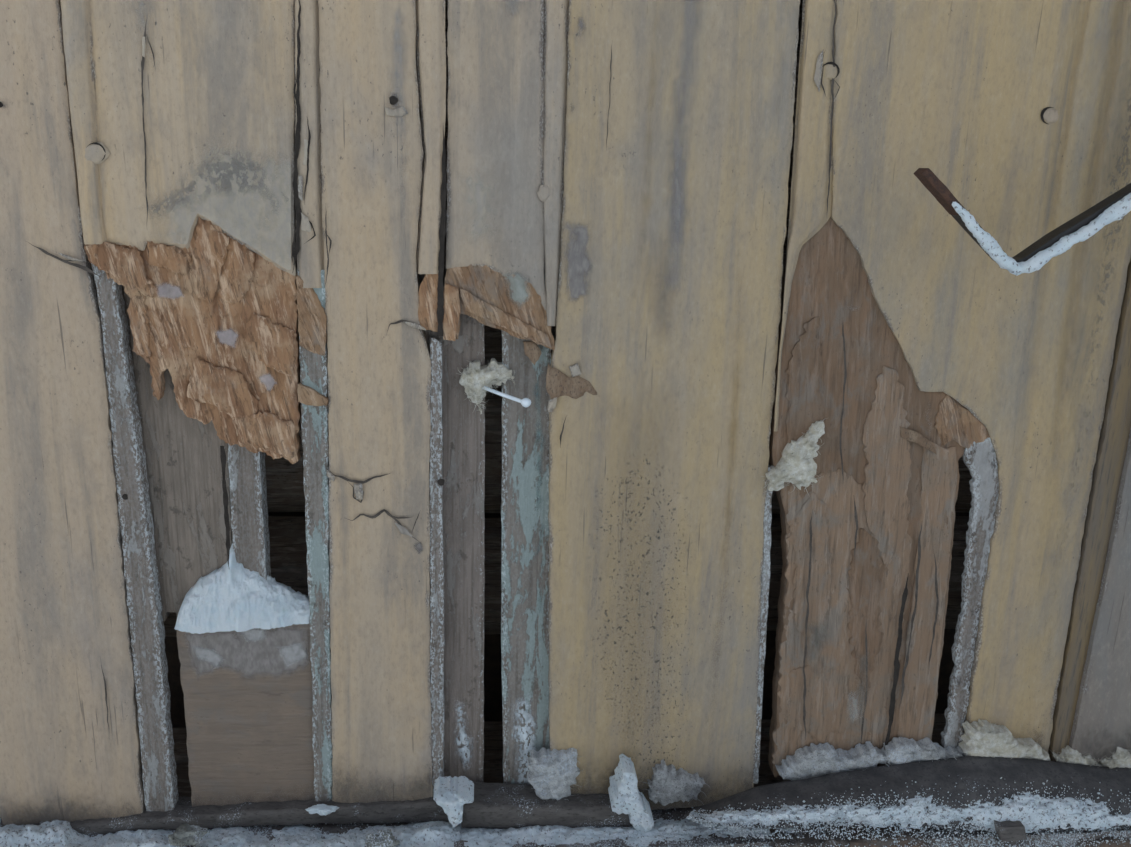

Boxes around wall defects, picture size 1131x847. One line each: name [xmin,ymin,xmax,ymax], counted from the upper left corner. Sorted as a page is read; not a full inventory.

crack [141,20,155,218]
peeling [173,156,327,356]
crack [326,469,420,541]
peeling [785,317,824,443]
peeling [786,457,853,743]
peeling [862,366,912,568]